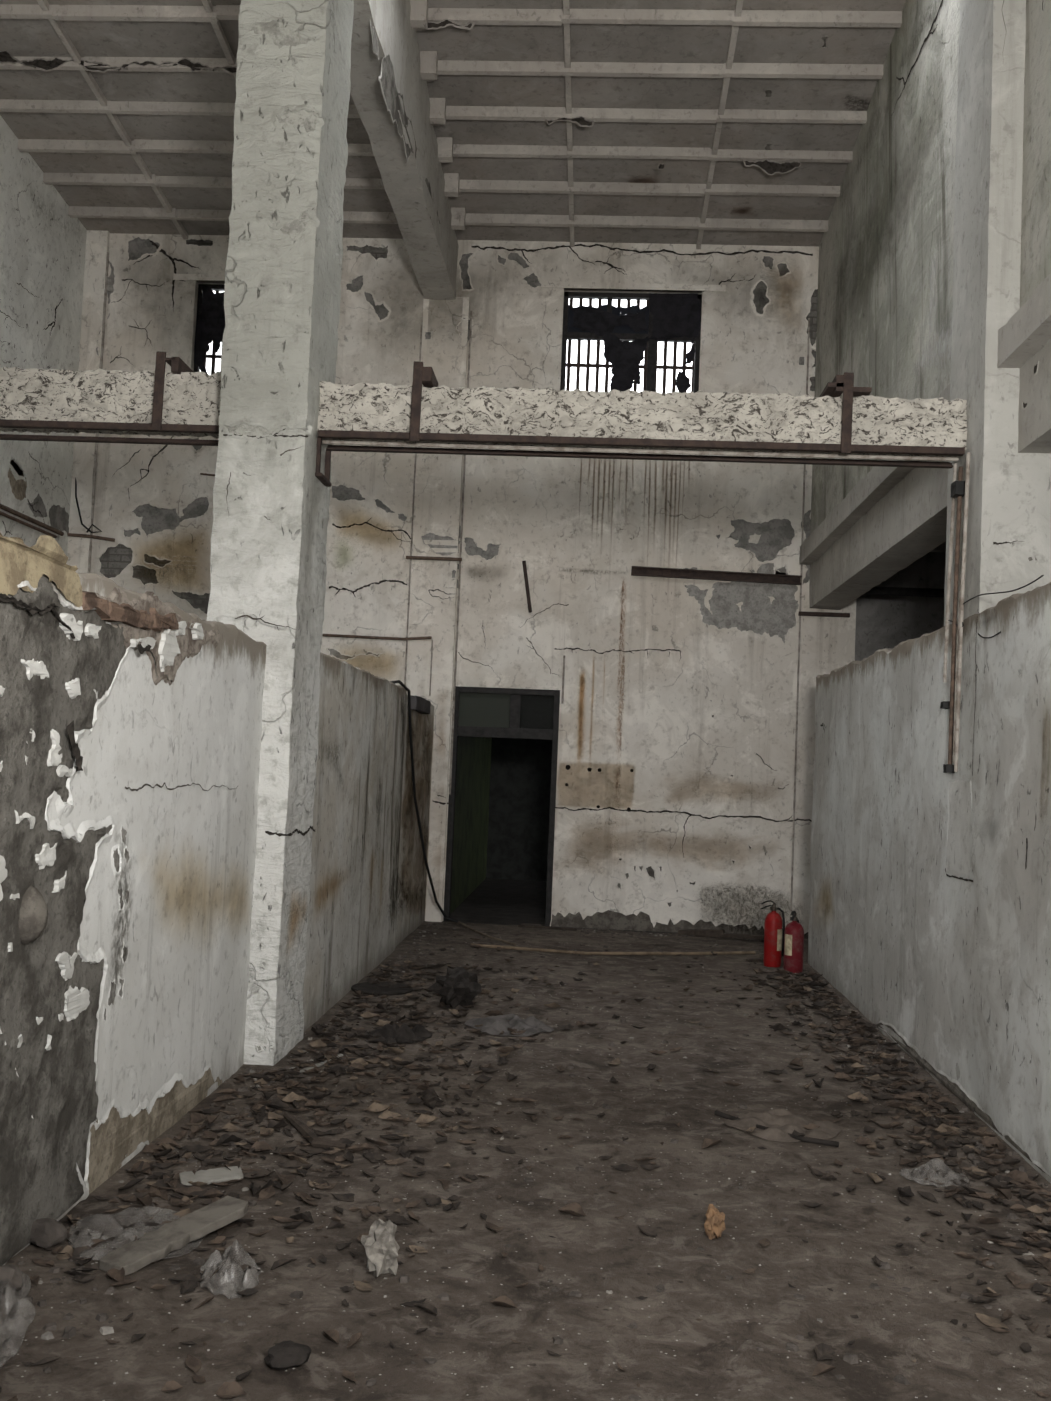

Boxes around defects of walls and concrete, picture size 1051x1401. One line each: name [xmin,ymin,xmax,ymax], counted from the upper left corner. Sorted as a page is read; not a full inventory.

spalling [0,51,237,75]
spalling [370,20,418,161]
peeling [180,436,205,453]
crack [332,517,411,542]
crack [329,580,454,599]
peeling [682,509,811,646]
crack [525,603,681,676]
crack [125,782,238,791]
crack [555,753,812,856]
peeling [0,454,238,1266]
peeling [616,858,662,890]
spalling [550,881,764,935]